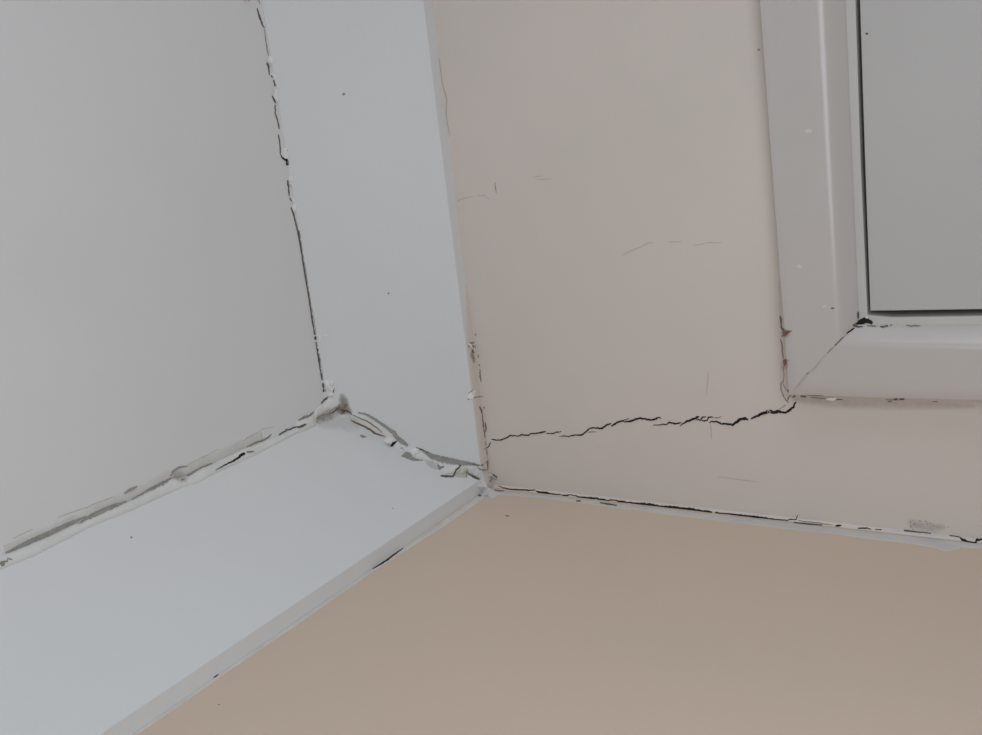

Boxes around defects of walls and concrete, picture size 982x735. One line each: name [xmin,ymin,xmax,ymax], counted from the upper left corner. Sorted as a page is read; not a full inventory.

crack [0,0,335,566]
peeling [401,447,423,461]
crack [350,281,982,543]